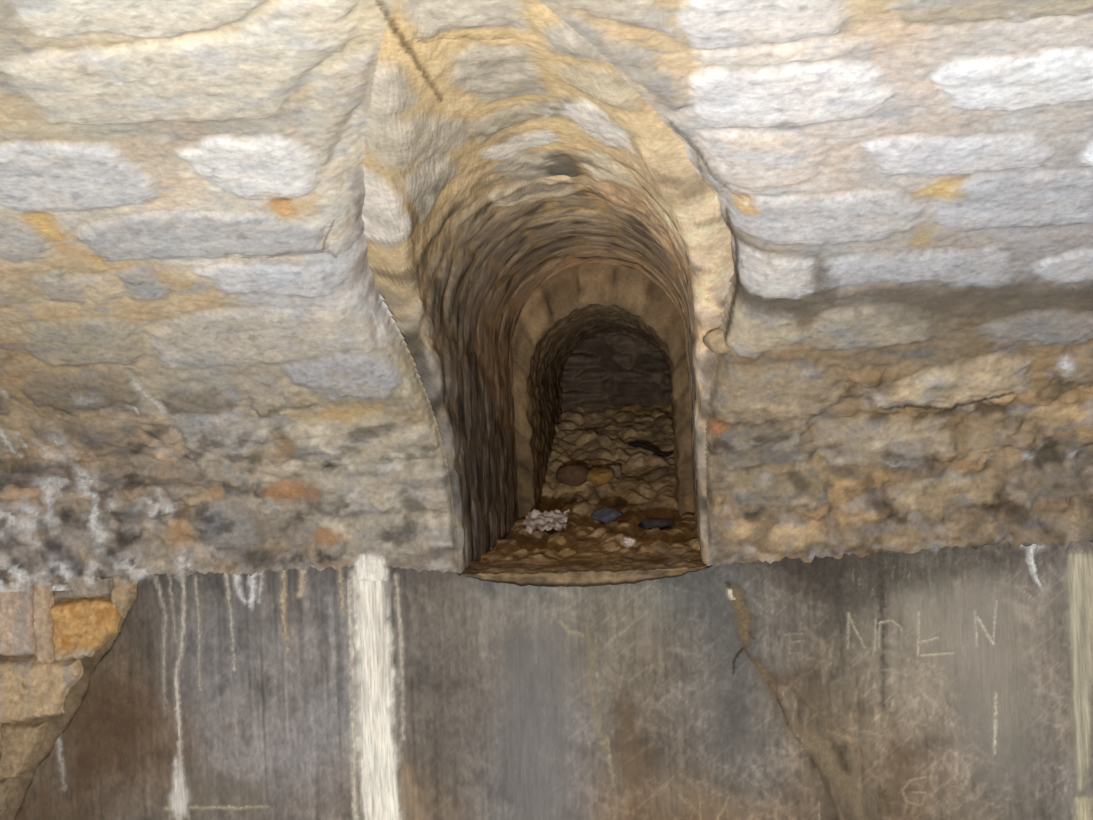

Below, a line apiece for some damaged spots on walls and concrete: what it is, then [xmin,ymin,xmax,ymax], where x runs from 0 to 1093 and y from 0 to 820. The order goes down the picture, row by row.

crack [376,0,509,102]
leakage [0,478,61,539]
leakage [78,471,105,542]
leakage [0,563,71,592]
flaking render [0,576,139,820]
leakage [115,557,263,820]
leakage [349,554,419,820]
crack [728,587,783,700]
leakage [1069,553,1093,820]